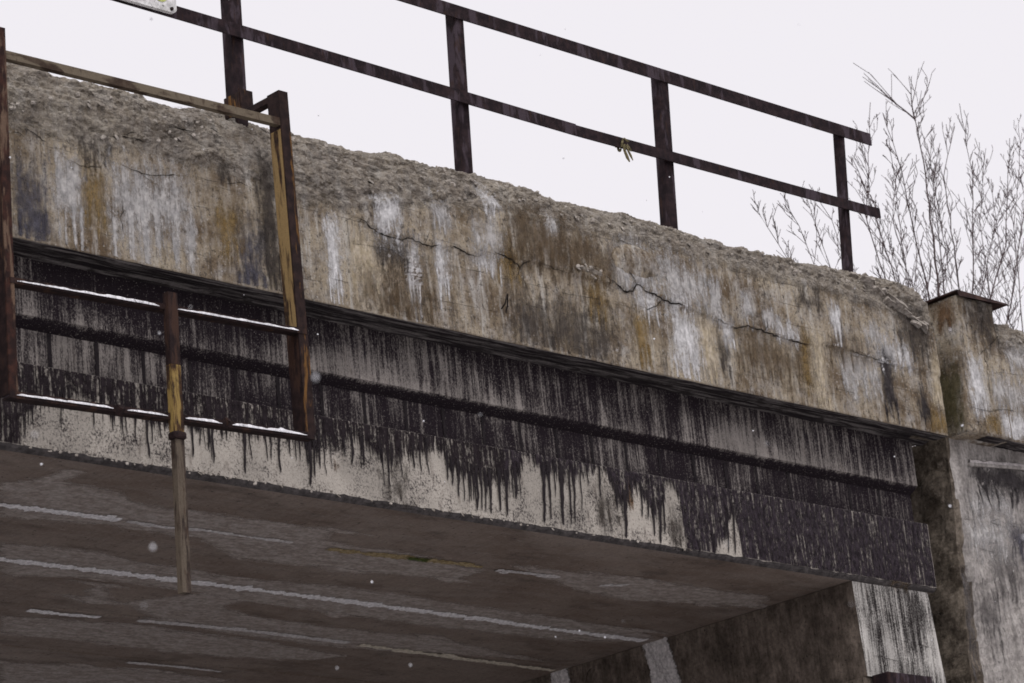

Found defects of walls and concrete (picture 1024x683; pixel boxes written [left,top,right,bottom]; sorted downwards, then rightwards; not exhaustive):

leakage [322,193,422,322]
leakage [429,187,452,309]
leakage [472,187,502,282]
leakage [505,291,615,362]
crack [342,207,928,414]
leakage [0,362,169,457]
leakage [0,469,175,536]
leakage [188,510,768,609]
leakage [182,391,936,587]
leakage [962,457,1024,678]